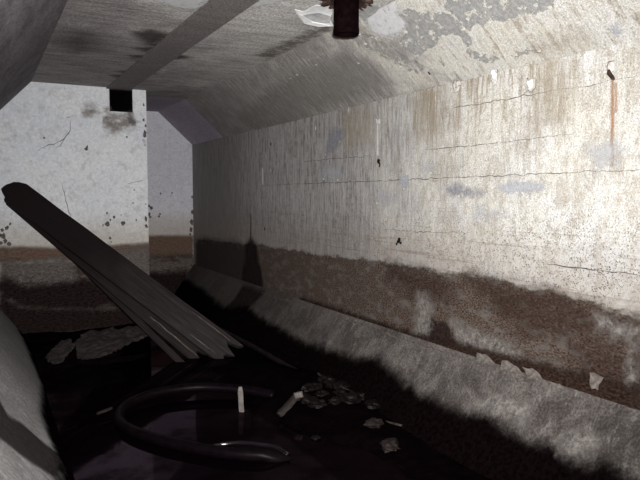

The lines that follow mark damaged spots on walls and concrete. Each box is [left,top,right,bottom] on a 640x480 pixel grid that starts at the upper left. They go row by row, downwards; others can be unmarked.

peeling [359,0,557,80]
crack [446,61,638,109]
water stain [105,115,135,131]
crack [263,170,603,186]
crack [547,264,635,288]
water stain [110,220,640,409]